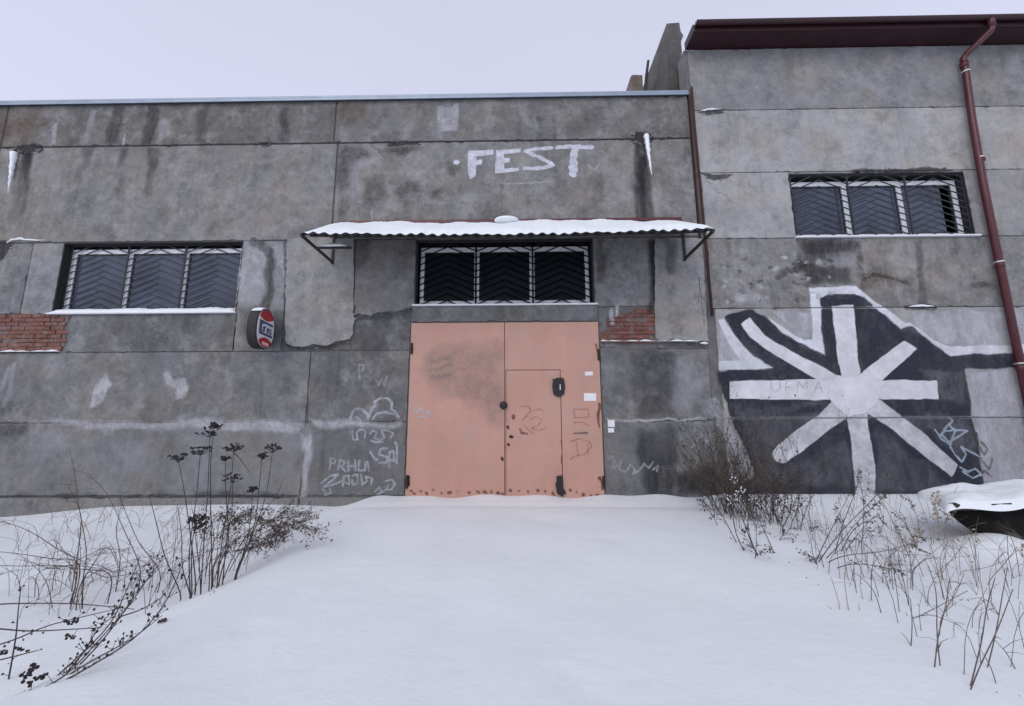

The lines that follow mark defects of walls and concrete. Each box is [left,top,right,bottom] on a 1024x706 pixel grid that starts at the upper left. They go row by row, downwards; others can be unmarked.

damp [635,144,648,202]
flaking render [0,314,71,352]
flaking render [600,309,708,348]